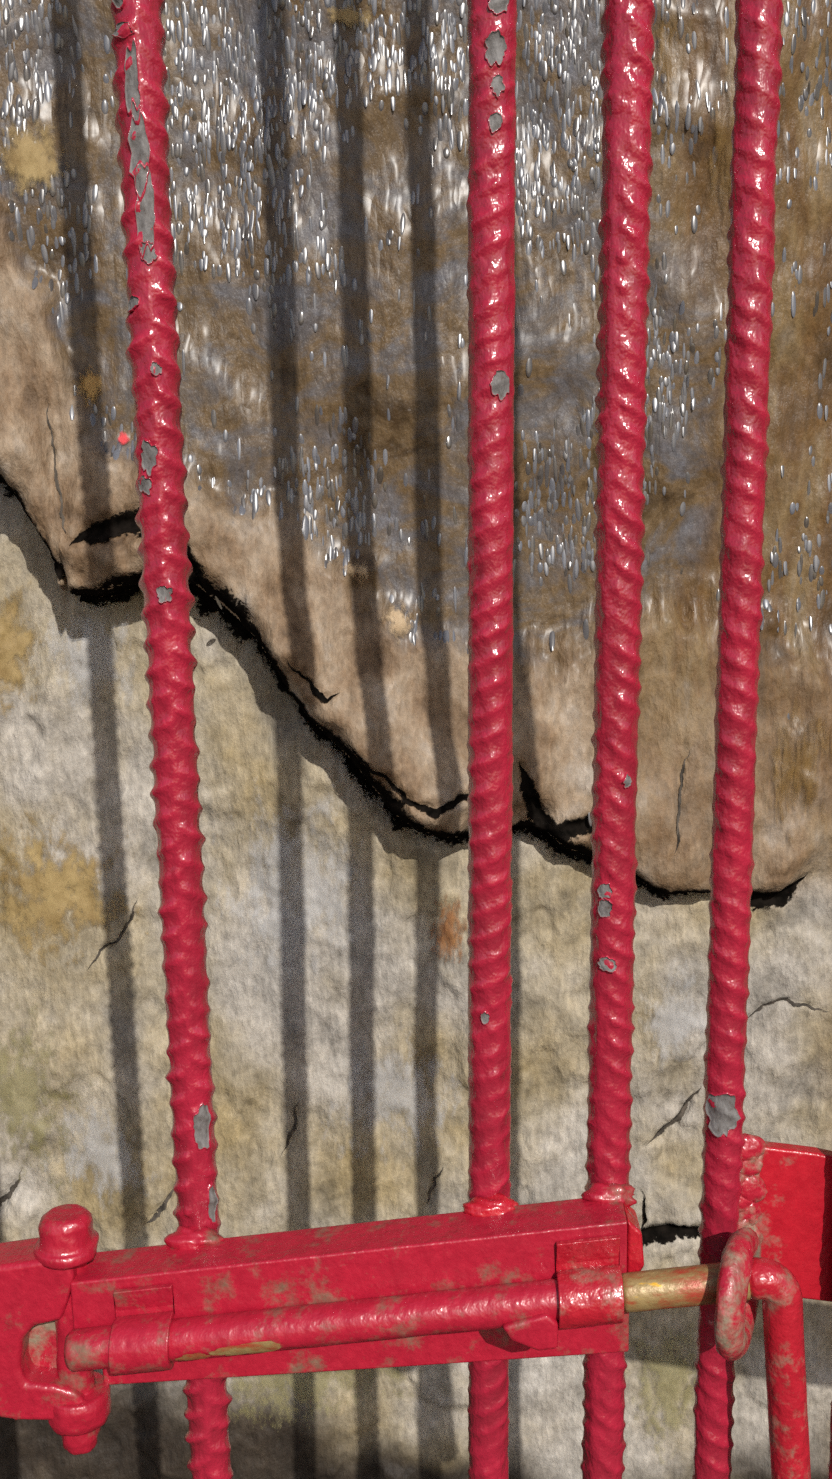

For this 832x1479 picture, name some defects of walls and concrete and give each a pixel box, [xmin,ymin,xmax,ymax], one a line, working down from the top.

leakage [0,0,98,328]
leakage [163,0,469,343]
leakage [515,0,603,301]
leakage [651,0,735,205]
leakage [776,0,832,209]
leakage [643,253,727,505]
leakage [771,247,832,336]
leakage [188,396,468,576]
leakage [513,388,599,594]
leakage [760,446,832,638]
crack [89,899,138,967]
crack [748,997,830,1018]